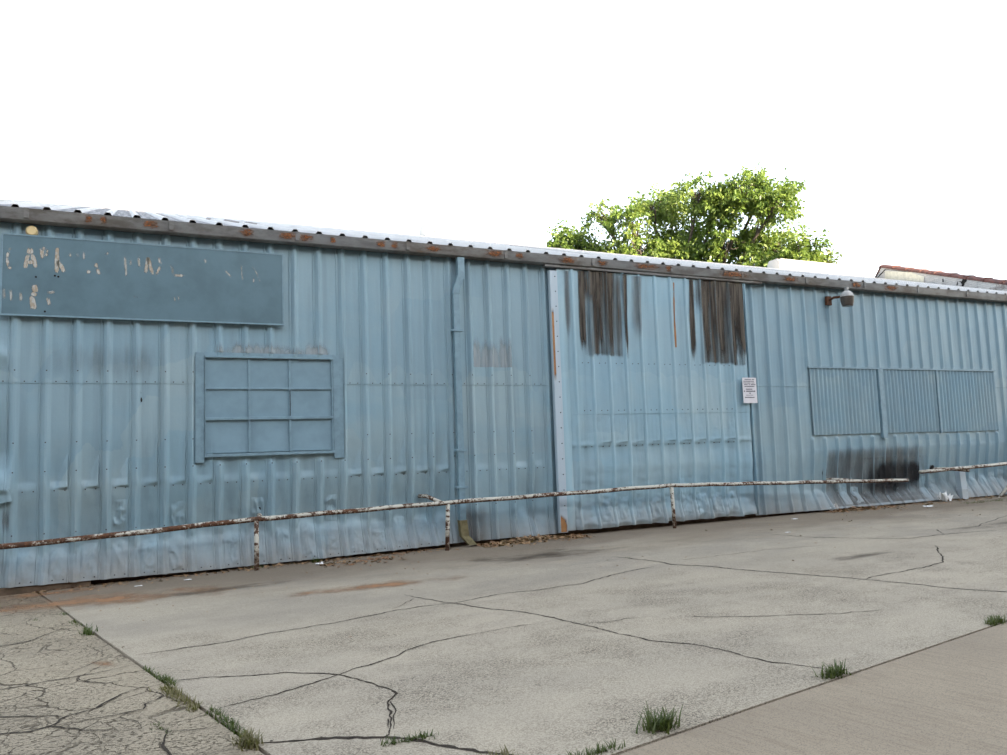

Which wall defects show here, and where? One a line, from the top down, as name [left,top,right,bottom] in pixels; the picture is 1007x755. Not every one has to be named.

water stain [565,270,640,356]
water stain [689,279,746,365]
water stain [879,465,891,483]
water stain [908,463,919,480]
crack [0,516,1006,755]